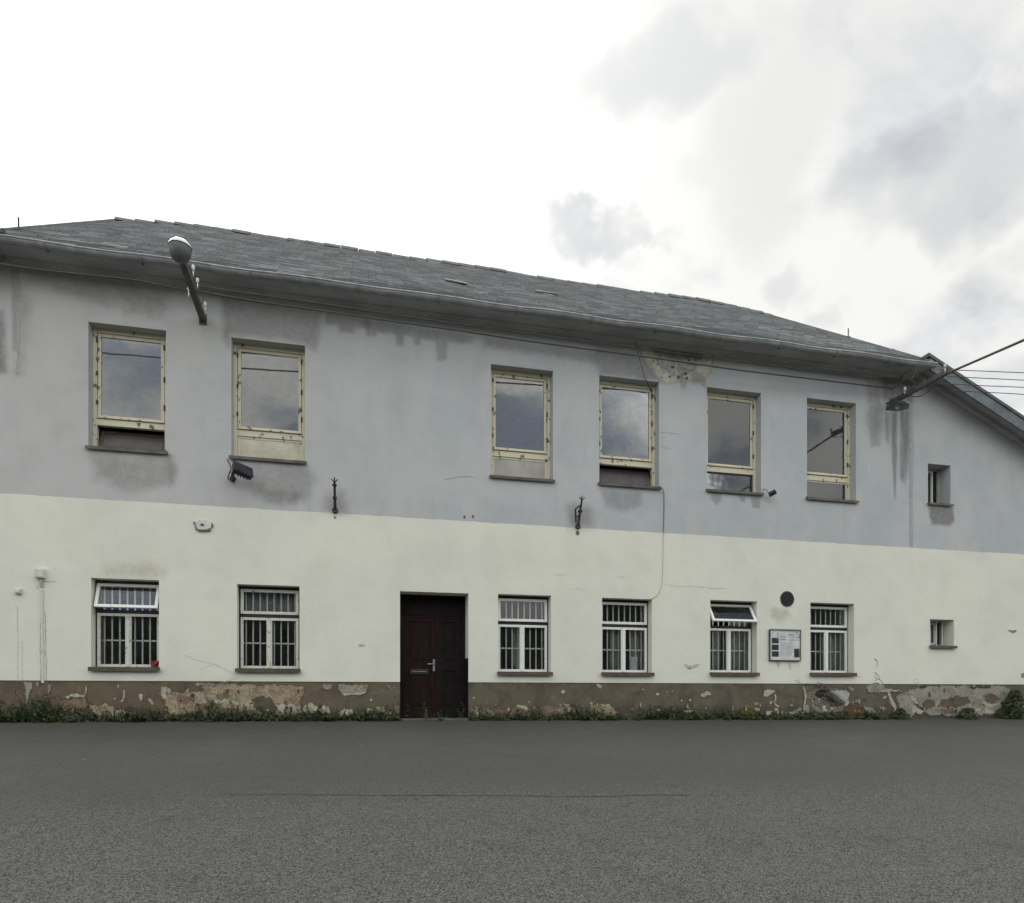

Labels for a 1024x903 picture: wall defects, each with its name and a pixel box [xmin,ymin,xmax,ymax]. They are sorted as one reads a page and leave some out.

peeling [640,346,713,383]
peeling [23,681,400,721]
peeling [656,682,1024,717]